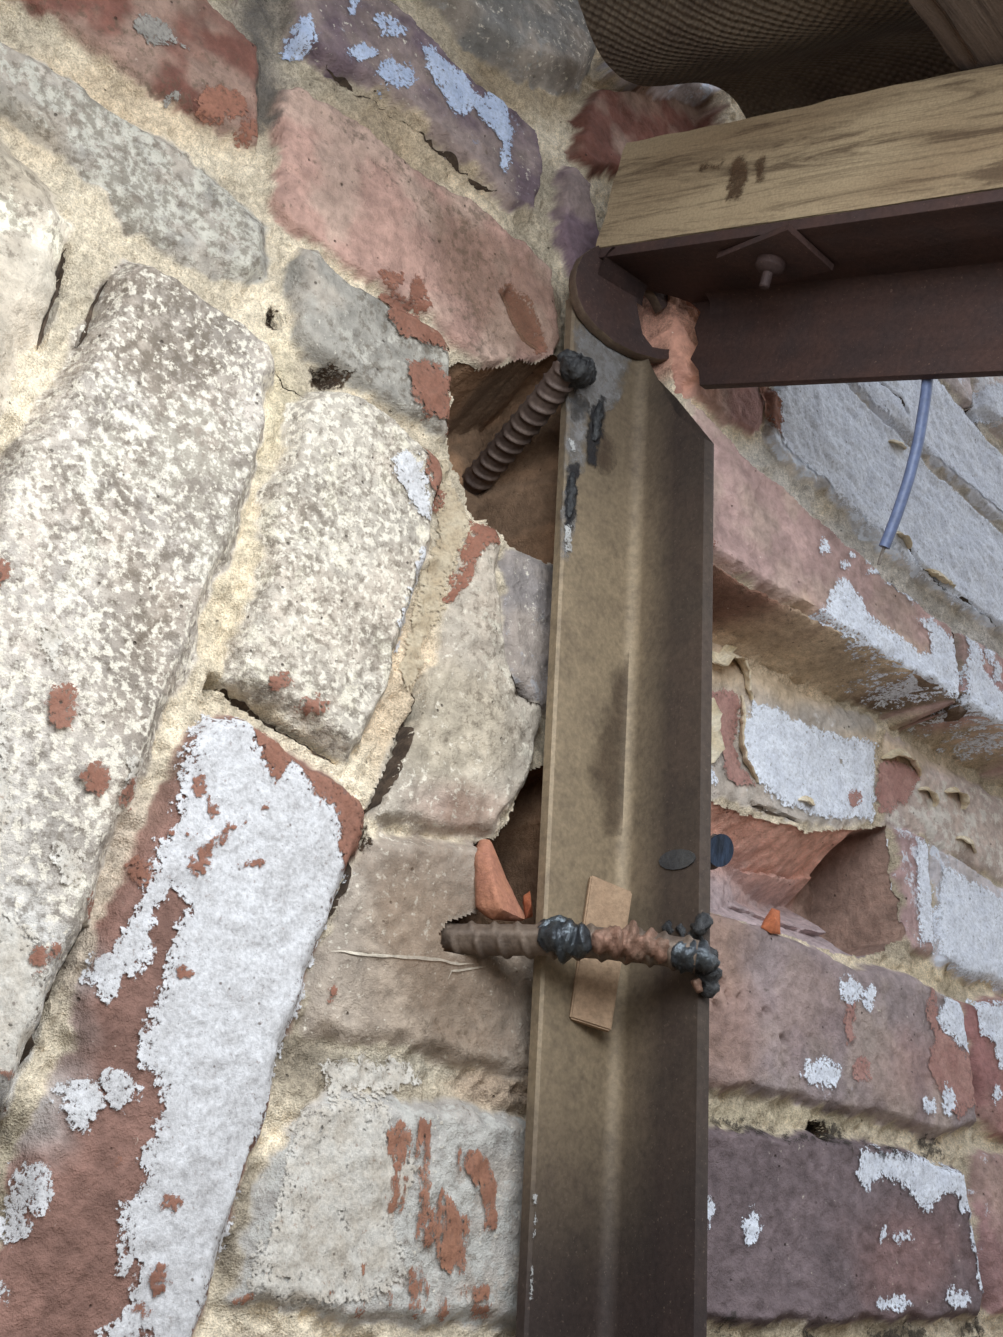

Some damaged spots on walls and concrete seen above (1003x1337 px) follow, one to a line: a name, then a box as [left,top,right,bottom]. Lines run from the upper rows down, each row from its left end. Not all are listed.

crack [37,249,66,349]
crack [77,281,107,347]
spalling [378,268,575,603]
peeling [759,379,1003,623]
peeling [268,671,330,719]
peeling [808,536,1003,761]
spalling [452,766,543,924]
spalling [710,645,970,959]
crack [18,925,83,1066]
peeling [800,974,877,1090]
peeling [923,987,976,1121]